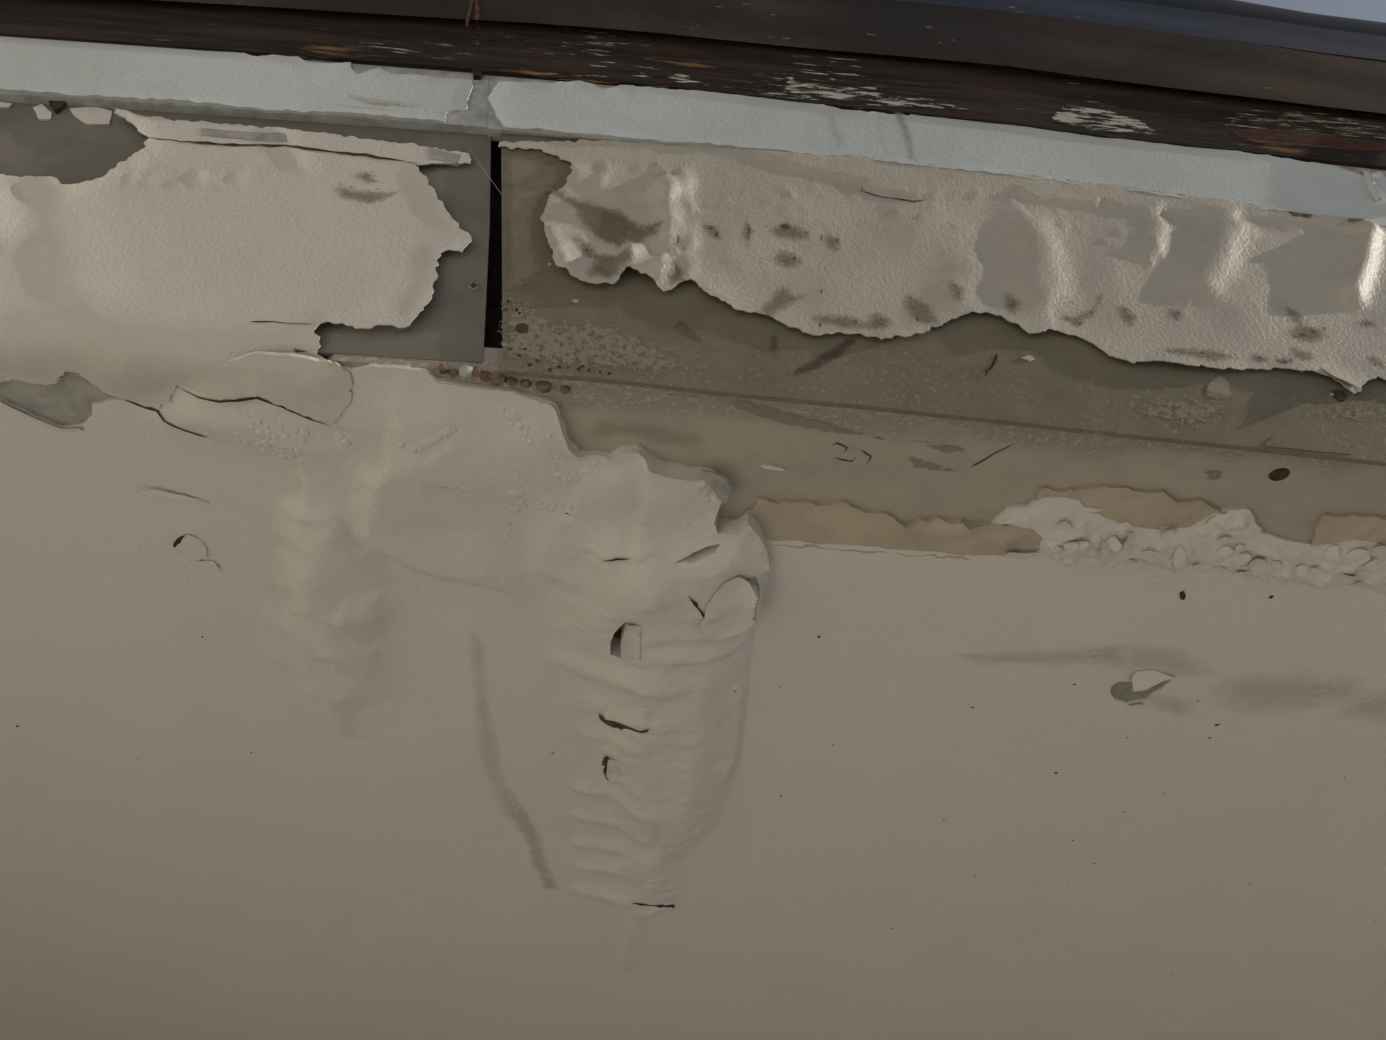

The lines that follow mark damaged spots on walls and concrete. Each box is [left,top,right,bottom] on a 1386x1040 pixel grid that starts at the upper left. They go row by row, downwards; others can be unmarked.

peeling [0,36,473,433]
peeling [488,80,1386,396]
peeling [1111,670,1176,709]